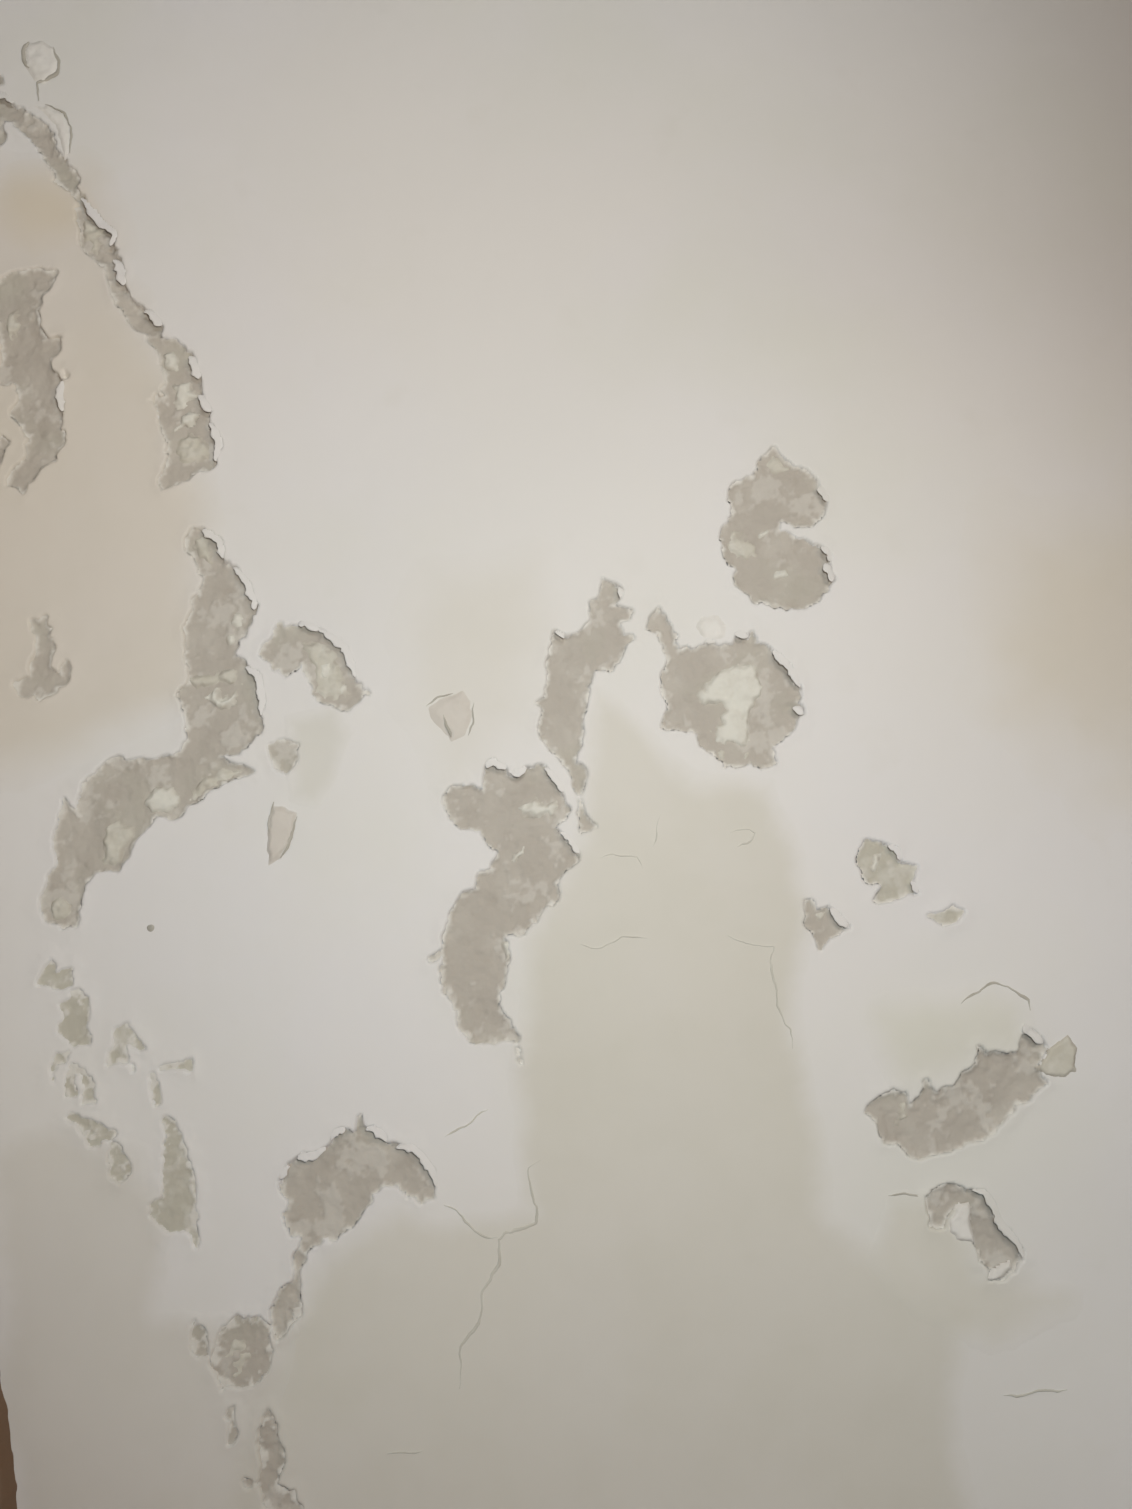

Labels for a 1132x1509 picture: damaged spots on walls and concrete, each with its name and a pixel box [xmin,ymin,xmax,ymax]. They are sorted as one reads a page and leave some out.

flaking render [0,75,223,494]
flaking render [719,447,835,610]
flaking render [41,529,370,929]
flaking render [428,578,804,1064]
flaking render [856,839,919,904]
flaking render [37,961,132,1182]
flaking render [107,1024,200,1248]
flaking render [191,1114,437,1389]
crack [446,1109,488,1136]
crack [444,1160,540,1389]
flaking render [865,1023,1077,1159]
flaking render [925,1183,1025,1281]